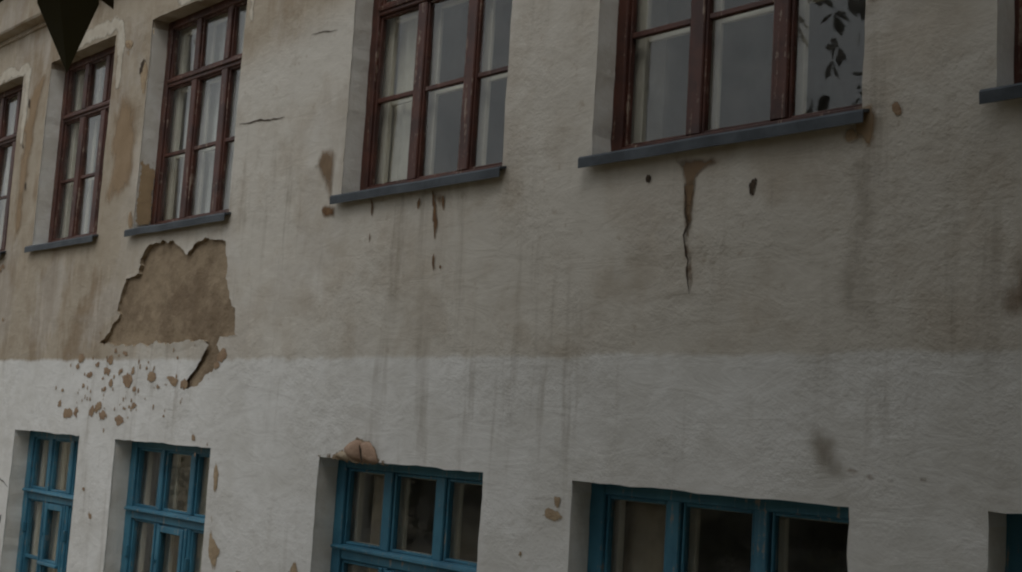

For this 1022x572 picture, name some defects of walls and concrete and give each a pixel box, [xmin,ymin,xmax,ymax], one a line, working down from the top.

peeling [107,98,155,228]
rust [680,159,714,225]
spalling [55,234,239,432]
peeling [543,497,562,521]
peeling [208,532,220,570]